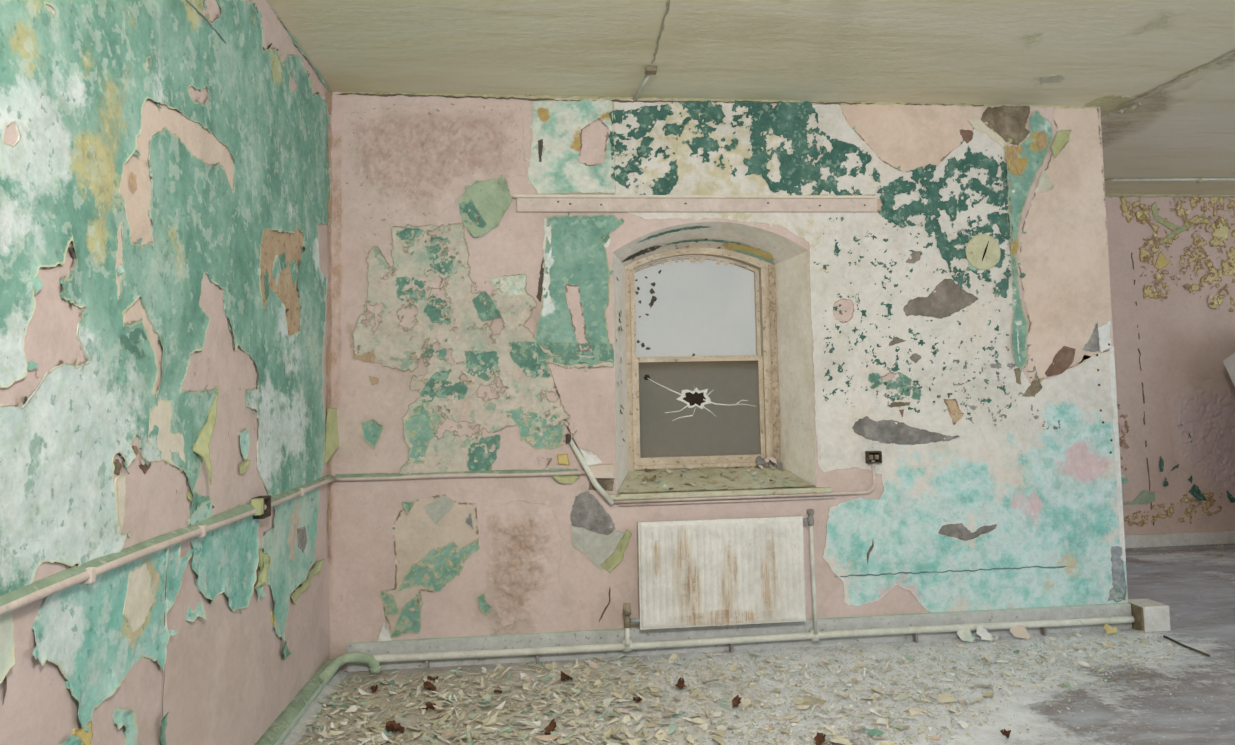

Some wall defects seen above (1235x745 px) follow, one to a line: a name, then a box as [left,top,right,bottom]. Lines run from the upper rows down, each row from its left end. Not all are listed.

crack [186,0,227,44]
crack [651,0,670,64]
crack [337,93,1006,107]
crack [1118,51,1235,107]
peeling [0,0,339,745]
crack [648,378,754,421]
peeling [352,95,1235,642]